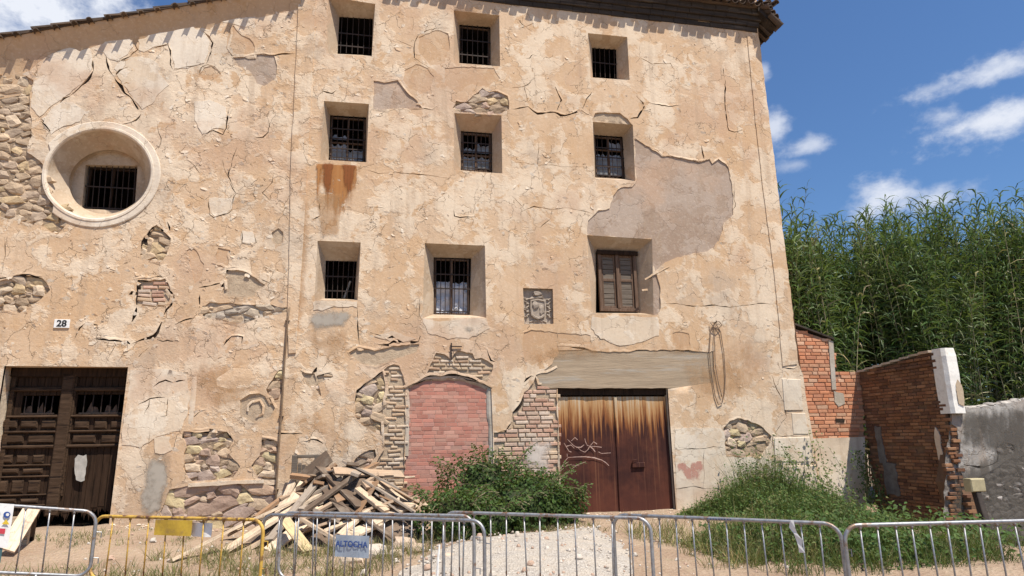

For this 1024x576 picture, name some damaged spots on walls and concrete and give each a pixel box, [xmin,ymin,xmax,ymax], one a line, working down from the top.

crack [41,26,295,139]
peeling [354,15,514,119]
crack [513,83,592,117]
spalling [0,10,297,368]
crack [73,110,270,345]
rust [316,163,357,214]
spalling [423,318,501,382]
peeling [492,138,734,485]
peeling [68,287,286,528]
peeling [675,416,811,510]